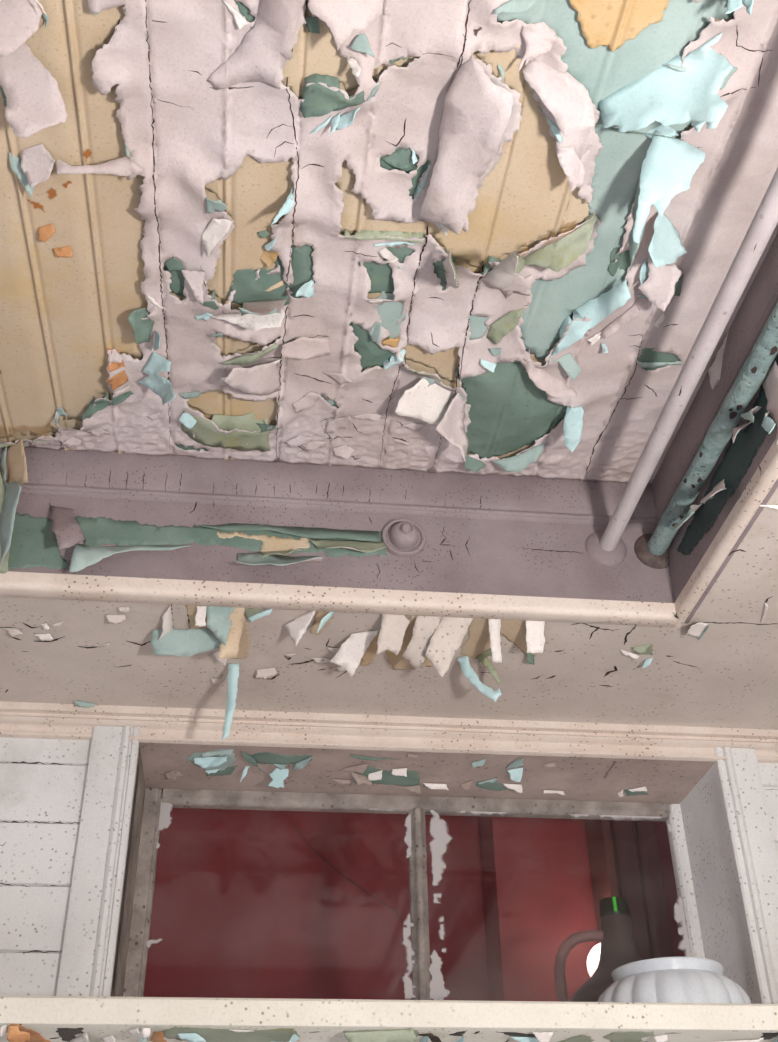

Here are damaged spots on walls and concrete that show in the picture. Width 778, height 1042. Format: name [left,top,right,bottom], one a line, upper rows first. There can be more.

crack [385,1,471,70]
crack [66,0,291,513]
peeling [0,0,417,574]
crack [266,77,484,460]
peeling [335,0,754,472]
crack [414,500,470,572]
peeling [673,354,778,556]
peeling [150,604,313,788]
peeling [311,614,545,702]
peeling [0,1023,116,1042]
peeling [128,1026,300,1042]
peeling [499,1031,668,1042]